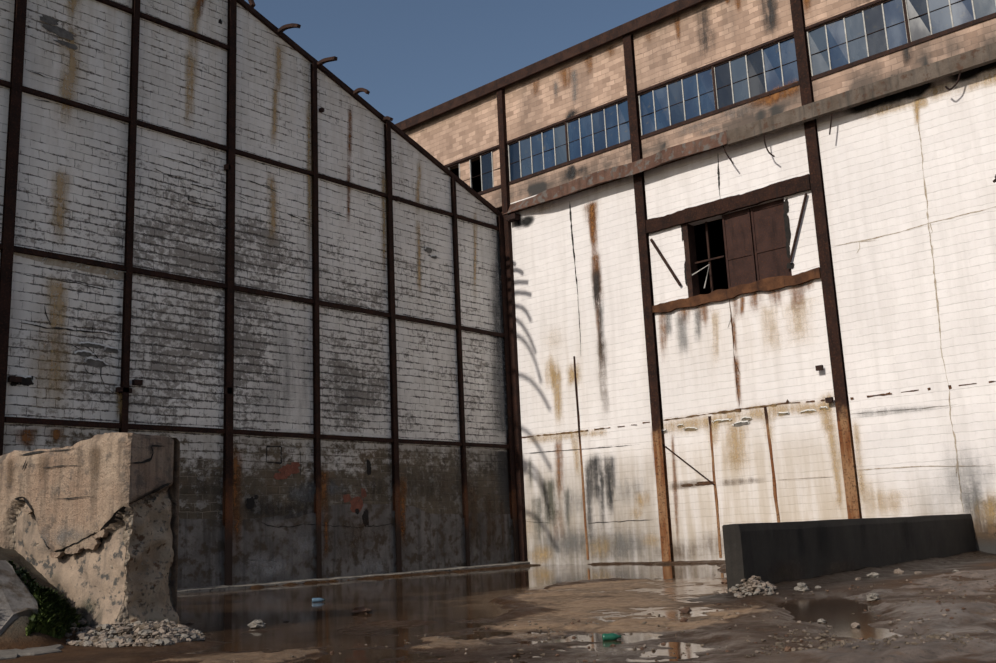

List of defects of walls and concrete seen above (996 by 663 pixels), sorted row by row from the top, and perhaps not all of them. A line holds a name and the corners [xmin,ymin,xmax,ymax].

corrosion [191,0,204,42]
damp [762,0,776,31]
corrosion [273,48,281,134]
damp [593,272,603,355]
crack [835,112,996,512]
damp [537,482,555,528]
damp [586,457,614,523]